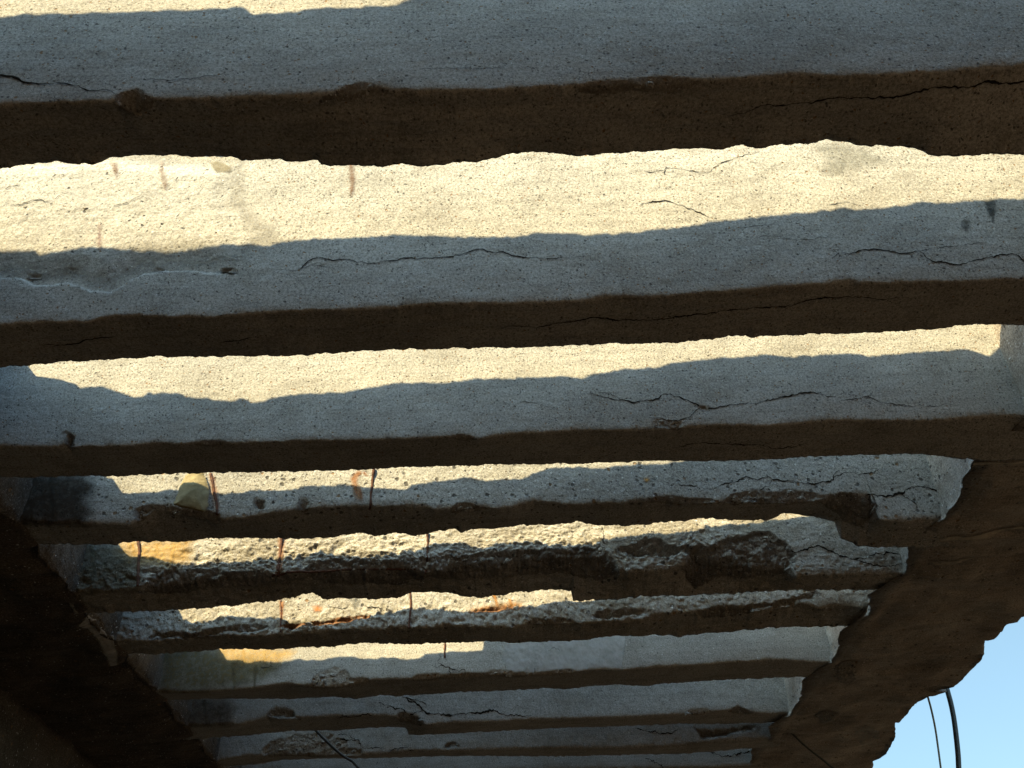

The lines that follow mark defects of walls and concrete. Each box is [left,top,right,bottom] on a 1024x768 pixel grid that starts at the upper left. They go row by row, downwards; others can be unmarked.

crack [0,74,115,94]
crack [728,80,1024,117]
crack [642,200,1024,265]
crack [277,249,579,271]
crack [586,392,954,449]
corrosion [352,472,362,498]
crack [672,468,937,503]
spalling [136,530,796,629]
crack [337,696,531,751]